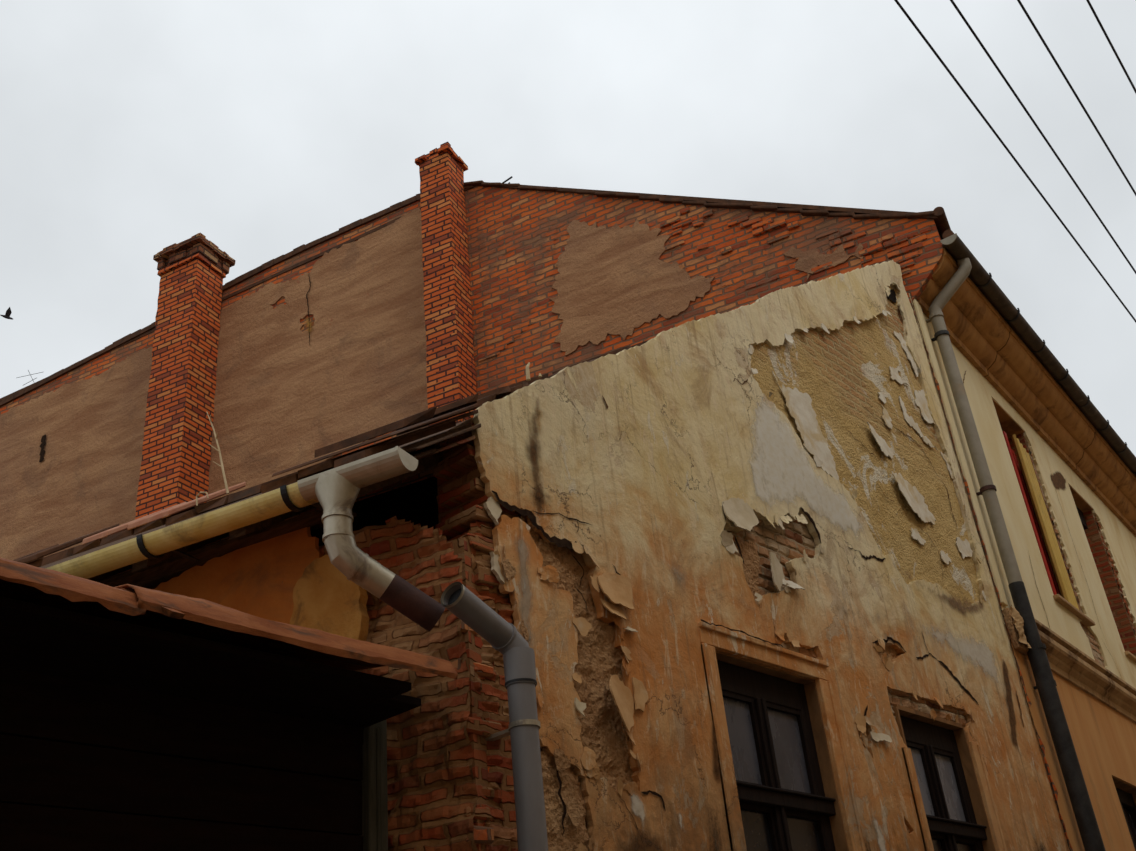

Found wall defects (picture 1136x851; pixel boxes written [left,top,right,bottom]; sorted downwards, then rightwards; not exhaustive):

flaking render [452,620,518,851]
flaking render [468,496,530,643]
flaking render [521,515,648,851]